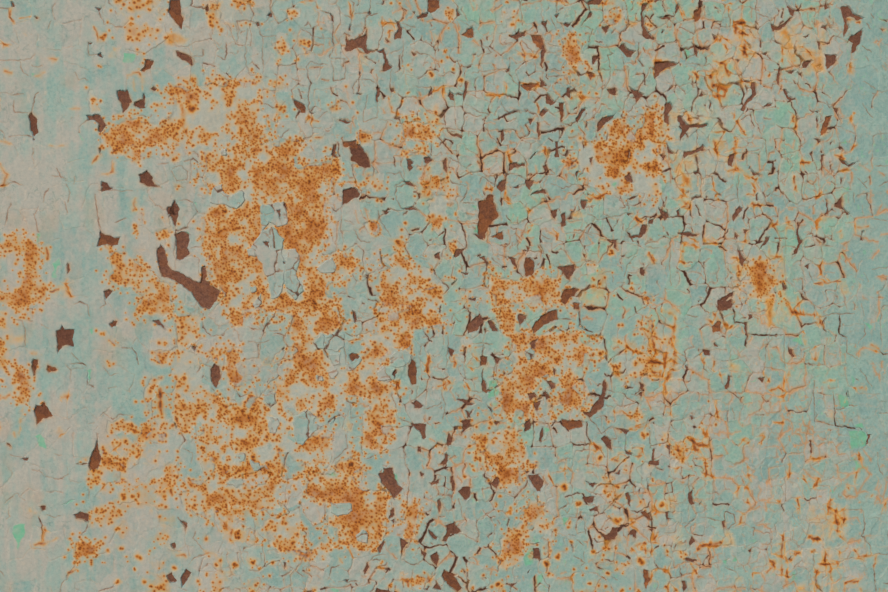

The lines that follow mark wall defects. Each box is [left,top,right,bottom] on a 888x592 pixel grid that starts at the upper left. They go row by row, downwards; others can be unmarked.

corrosion [0,226,77,419]
peeling [157,230,220,309]
peeling [343,140,370,168]
corrosion [28,65,755,592]
corrosion [383,0,467,245]
peeling [469,175,534,240]
crack [430,0,637,257]
peeling [518,265,579,360]
crack [579,356,670,459]
corrosion [539,12,860,364]
crack [667,139,888,476]
crack [741,3,830,112]